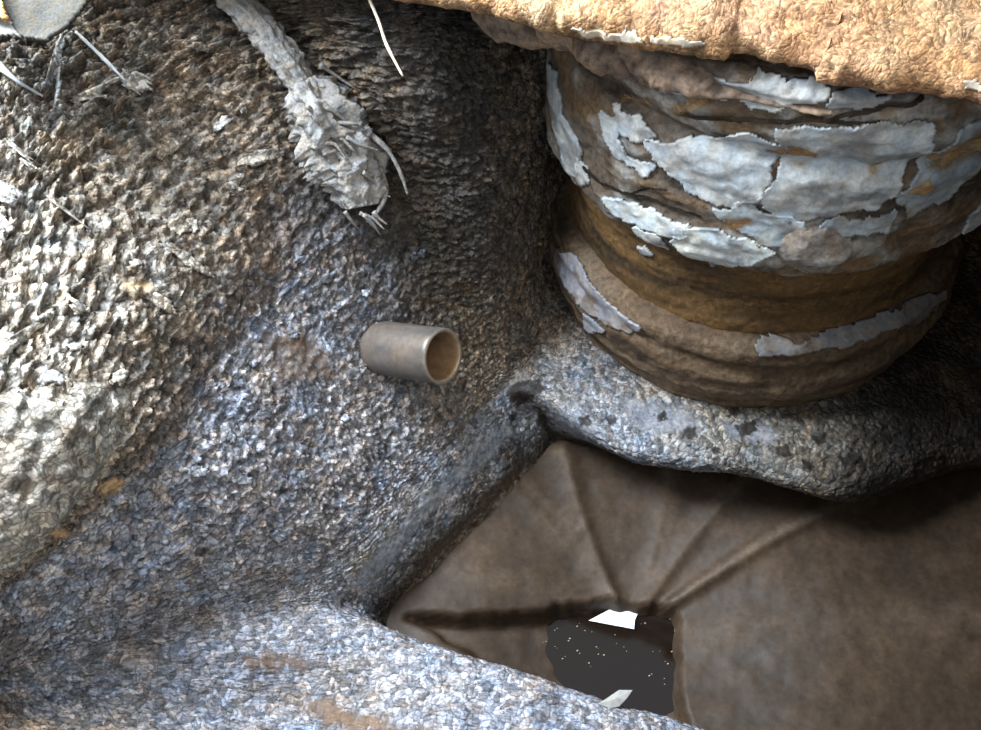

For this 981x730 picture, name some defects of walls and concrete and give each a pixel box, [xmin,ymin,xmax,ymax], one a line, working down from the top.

peeling [571,27,706,48]
peeling [713,65,893,114]
peeling [963,79,981,93]
peeling [546,62,591,187]
peeling [597,101,981,268]
rust [725,219,751,229]
peeling [553,247,642,334]
peeling [754,289,947,358]